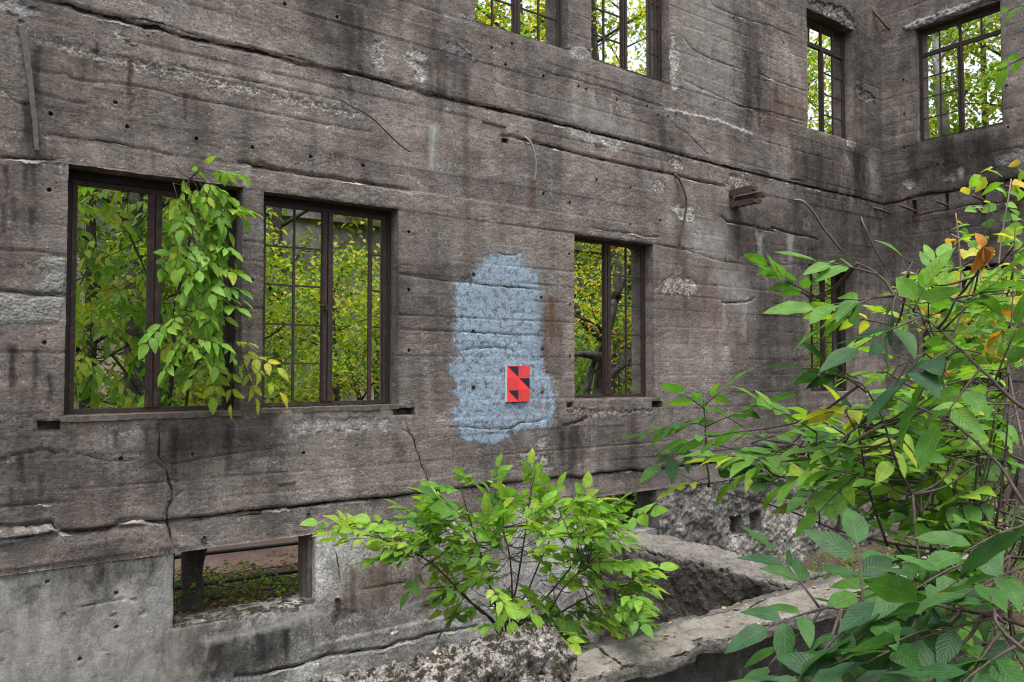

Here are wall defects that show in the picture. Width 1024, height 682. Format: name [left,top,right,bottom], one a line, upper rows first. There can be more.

crack [2,424,713,545]